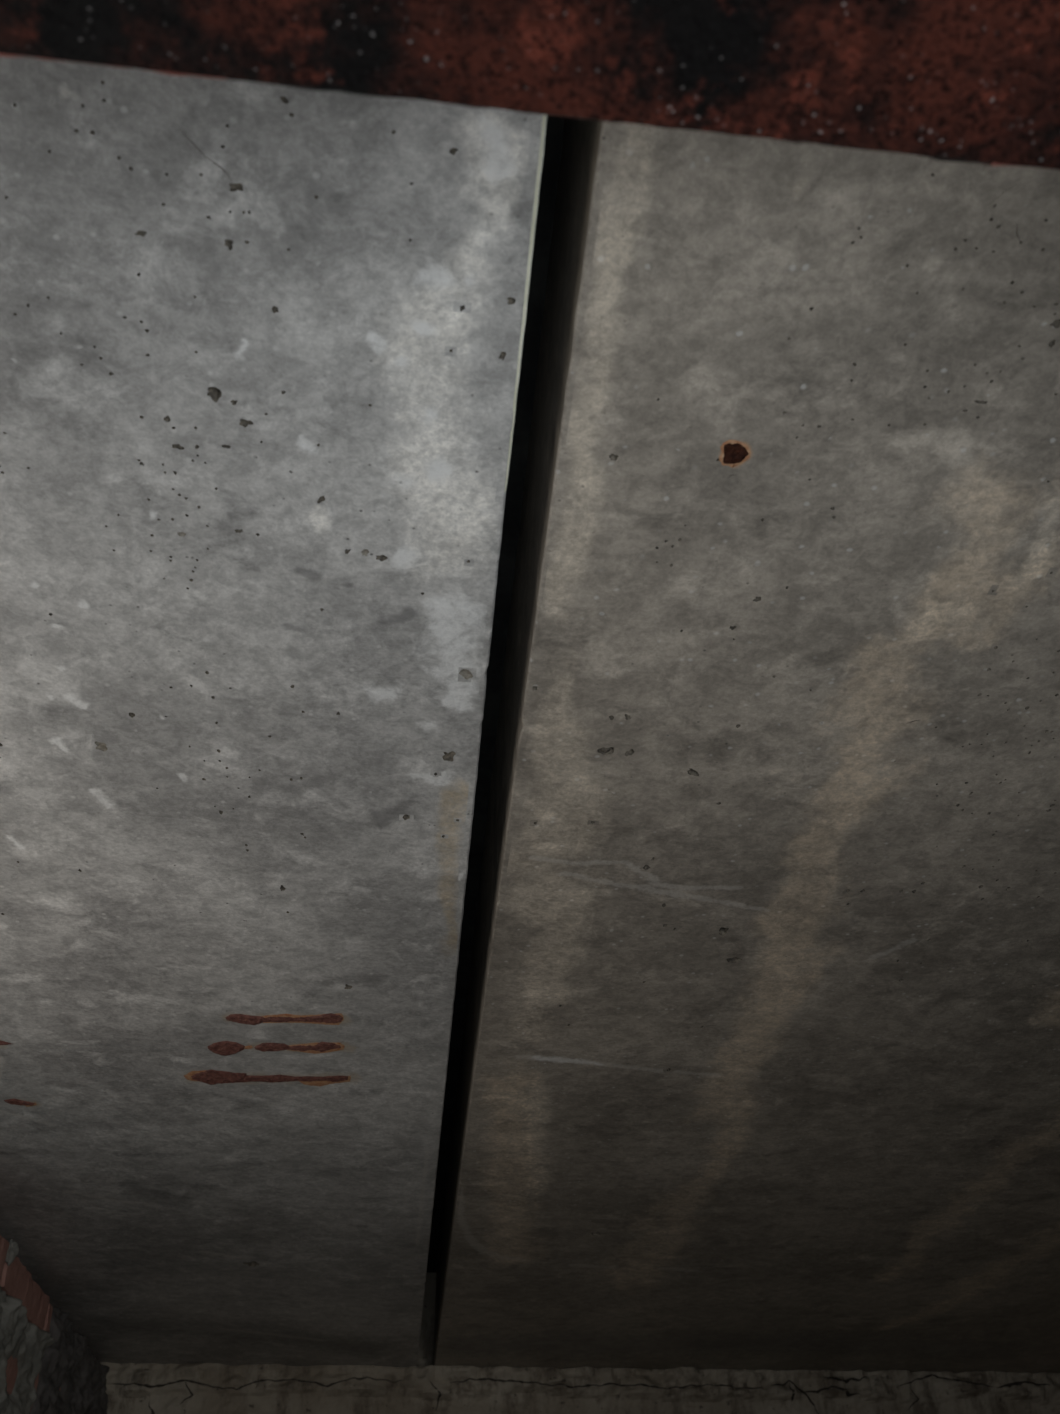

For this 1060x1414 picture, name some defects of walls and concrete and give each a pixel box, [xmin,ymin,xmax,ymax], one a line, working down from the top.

corrosion [710,433,761,473]
corrosion [177,1009,365,1089]
crack [112,1374,1049,1414]